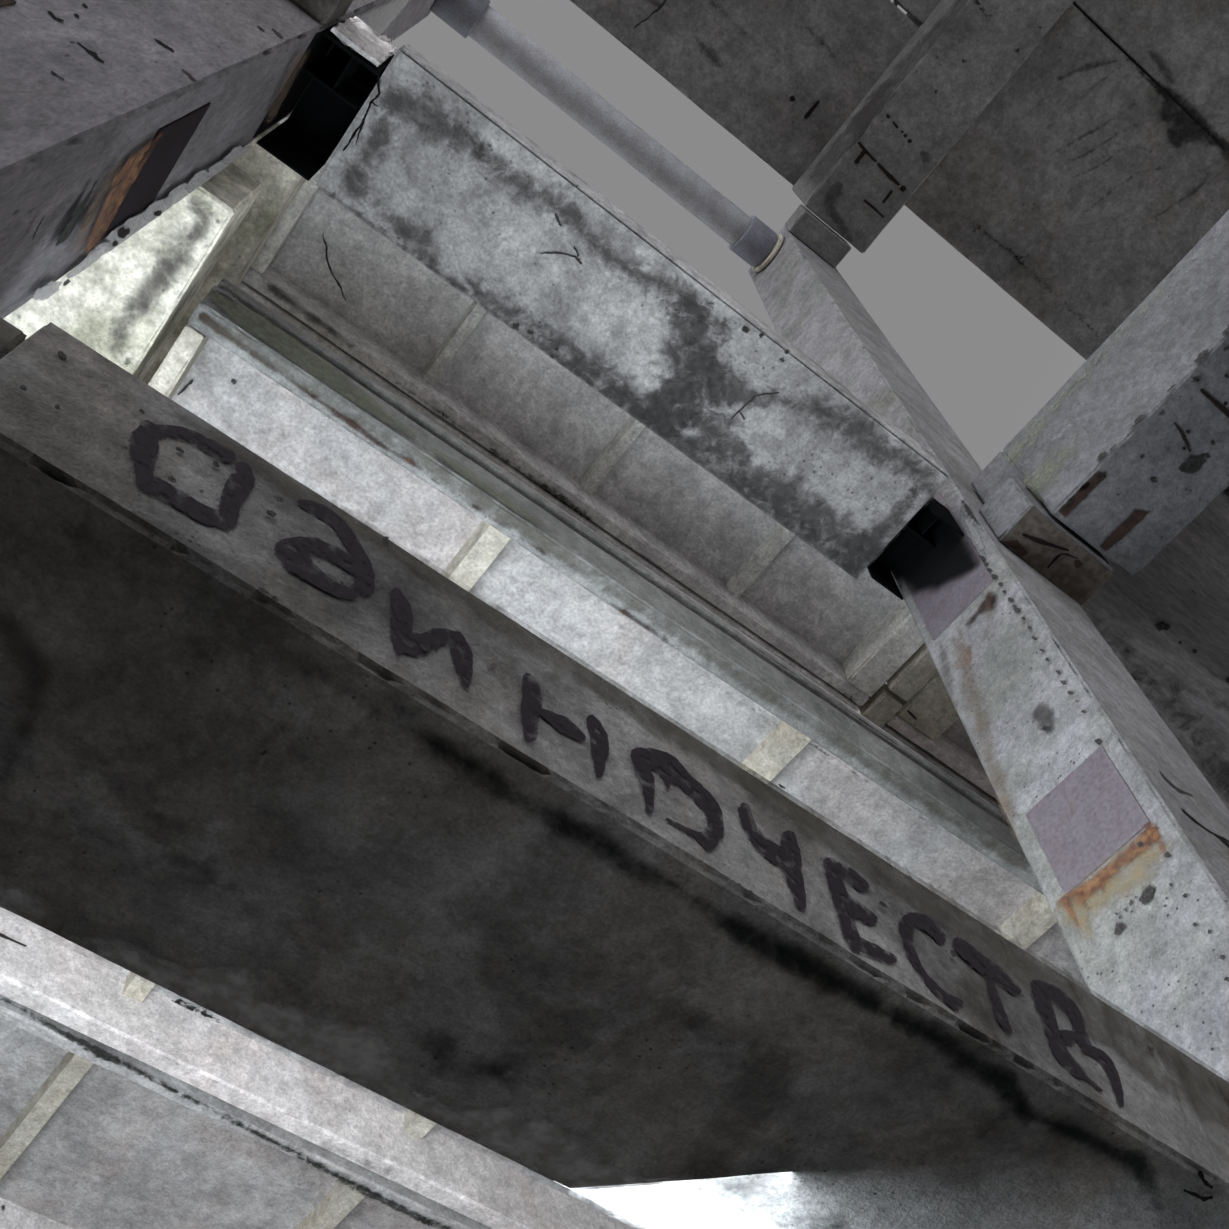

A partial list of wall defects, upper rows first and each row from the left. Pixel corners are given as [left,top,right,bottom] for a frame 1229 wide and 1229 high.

crack [634,0,667,28]
rust [73,136,160,251]
crack [323,234,346,301]
damp [328,84,934,580]
damp [420,734,514,802]
damp [542,809,674,886]
rust [1060,822,1164,929]
damp [1,998,450,1229]
damp [105,944,779,1229]
damp [717,918,1153,1189]